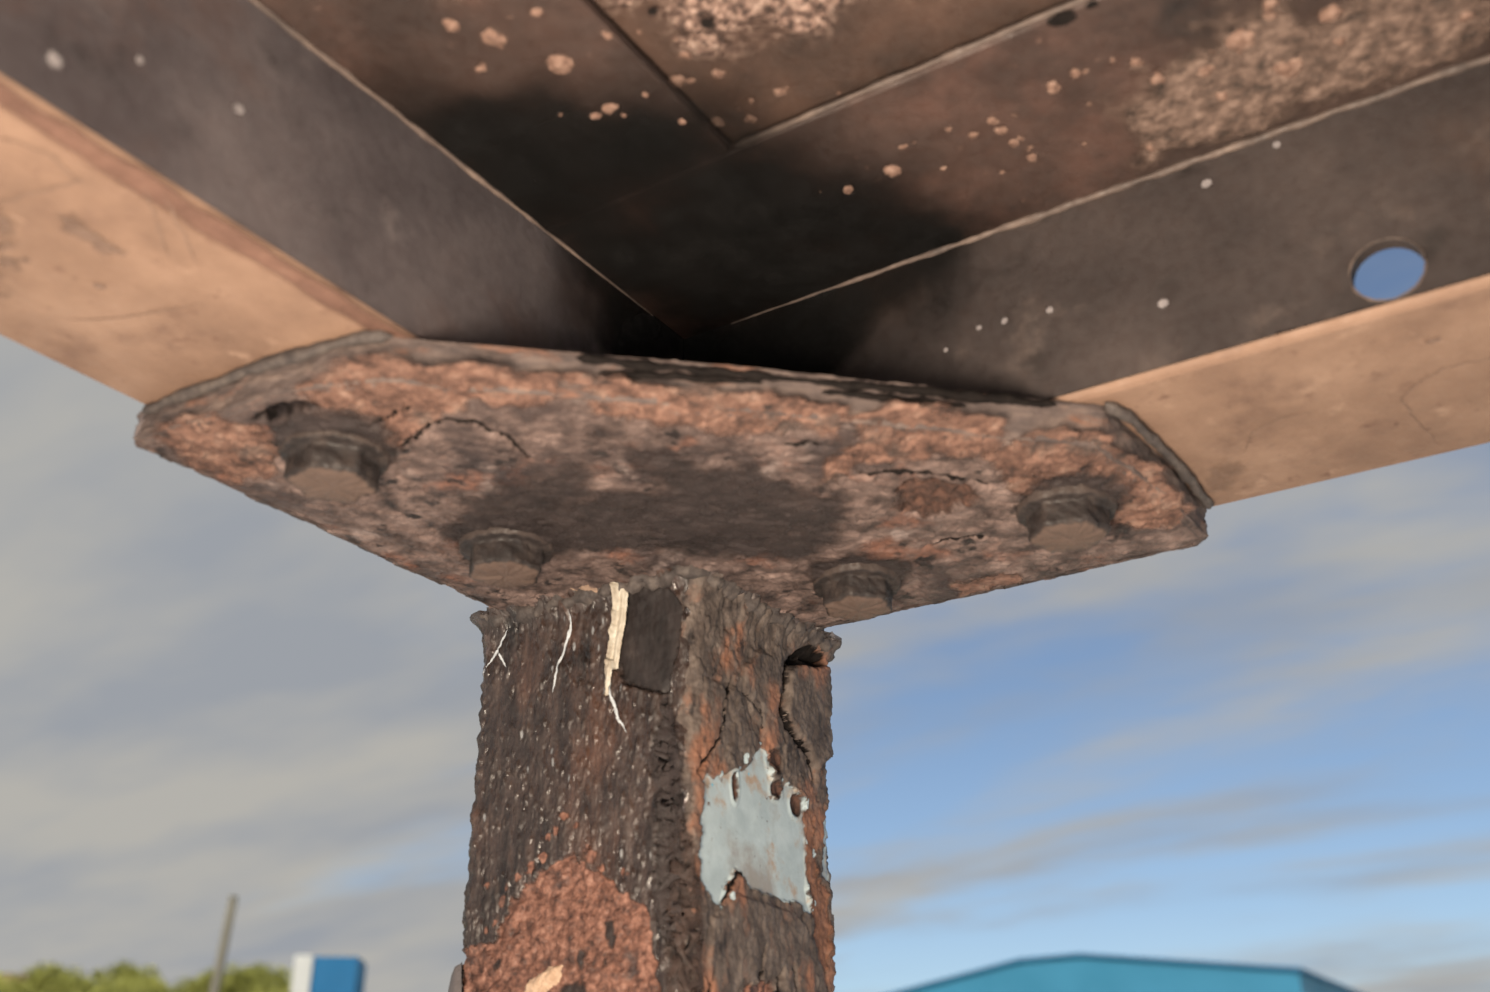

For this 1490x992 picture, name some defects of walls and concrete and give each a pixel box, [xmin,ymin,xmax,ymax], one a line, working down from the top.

corrosion [546,55,574,74]
spalling [608,0,850,58]
corrosion [0,83,412,339]
water stain [407,85,987,376]
crack [378,405,529,457]
water stain [443,434,913,585]
corrosion [296,355,1195,530]
peeling [604,582,628,696]
crack [700,645,823,765]
spalling [448,812,661,992]
peeling [698,742,829,914]
corrosion [802,810,834,971]